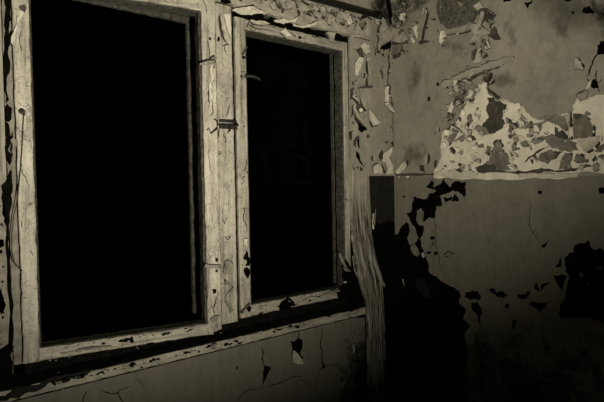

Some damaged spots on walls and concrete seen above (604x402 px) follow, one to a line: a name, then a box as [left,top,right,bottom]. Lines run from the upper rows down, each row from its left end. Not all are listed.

spalling [0,0,171,402]
crack [236,330,338,400]
peeling [207,0,604,402]